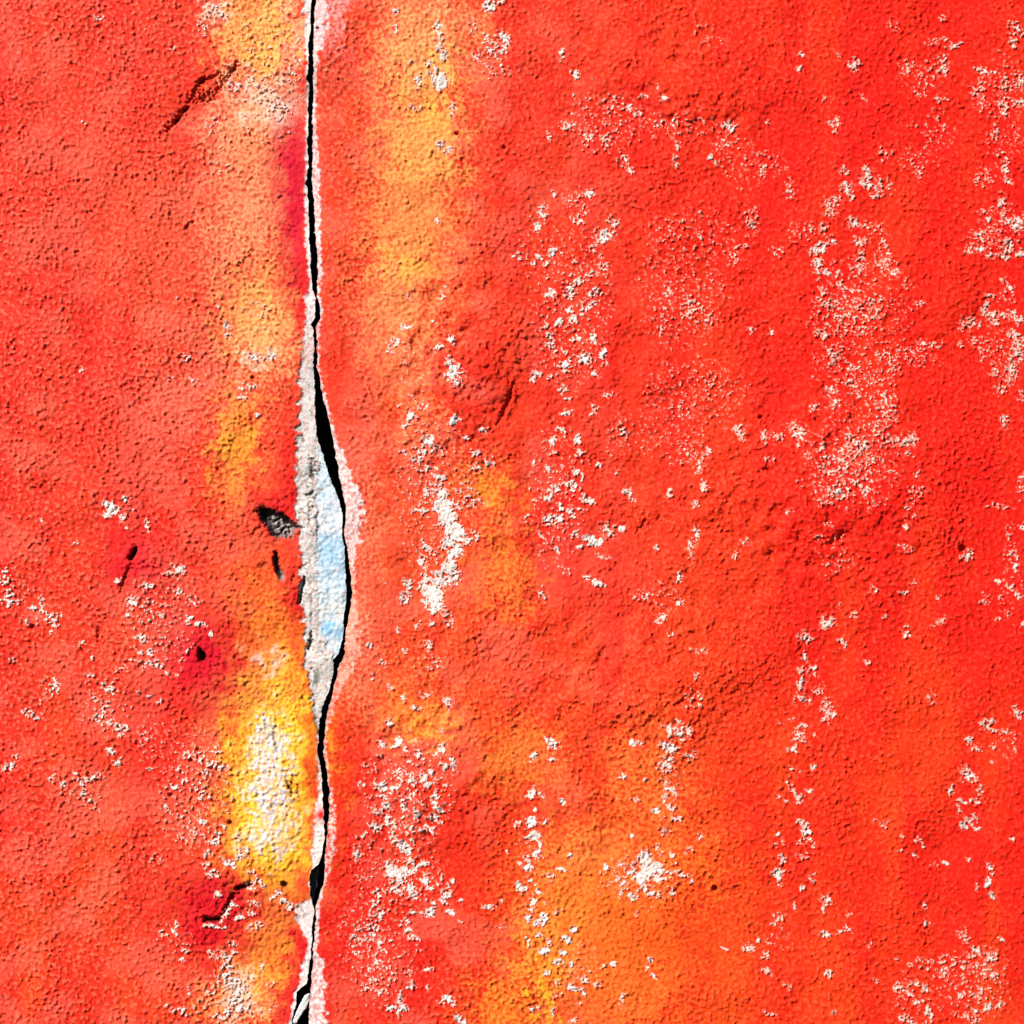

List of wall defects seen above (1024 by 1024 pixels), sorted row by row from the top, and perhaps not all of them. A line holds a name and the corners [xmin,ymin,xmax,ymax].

flaking render [82,0,373,1024]
crack [292,0,353,1024]
peeling [0,567,62,635]
peeling [20,677,61,720]
peeling [48,770,105,813]